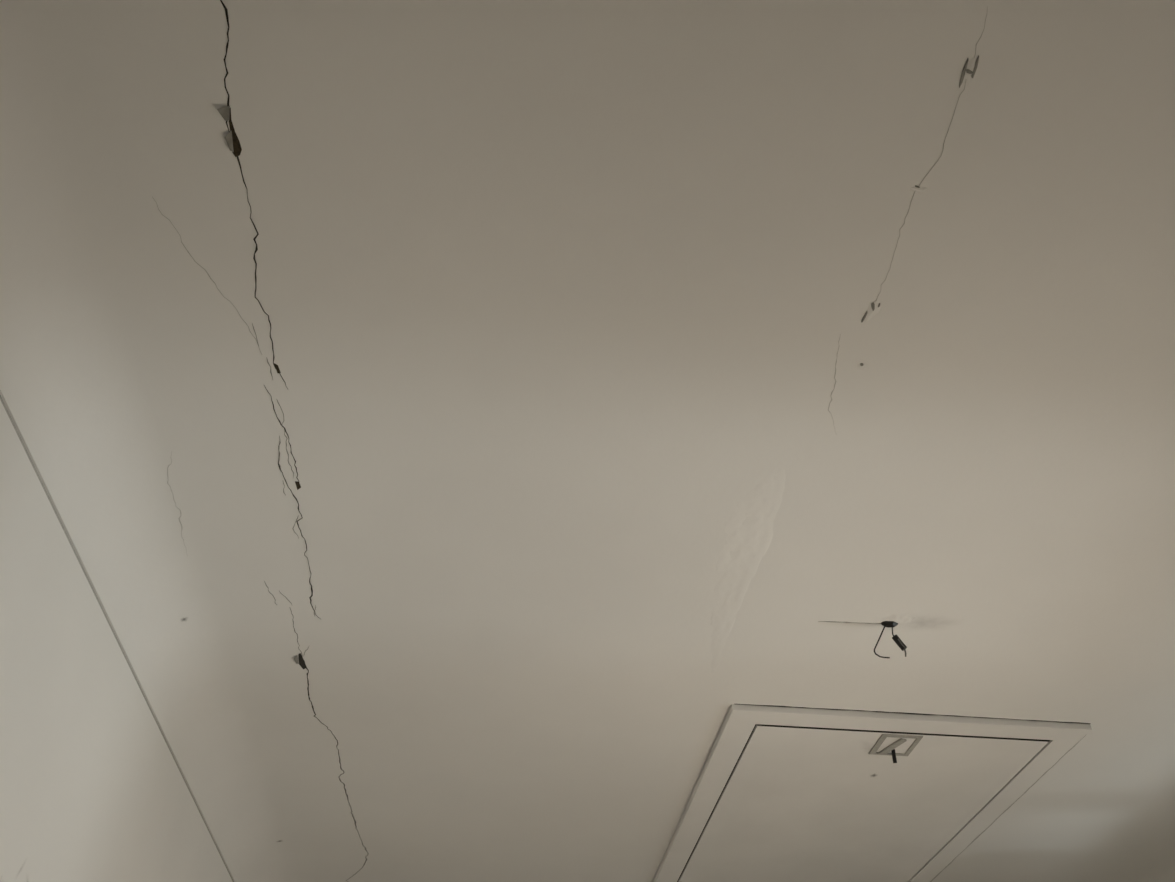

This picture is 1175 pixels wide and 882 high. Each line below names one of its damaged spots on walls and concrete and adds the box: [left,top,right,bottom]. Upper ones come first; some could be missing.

crack [152,0,368,880]
crack [876,15,987,300]